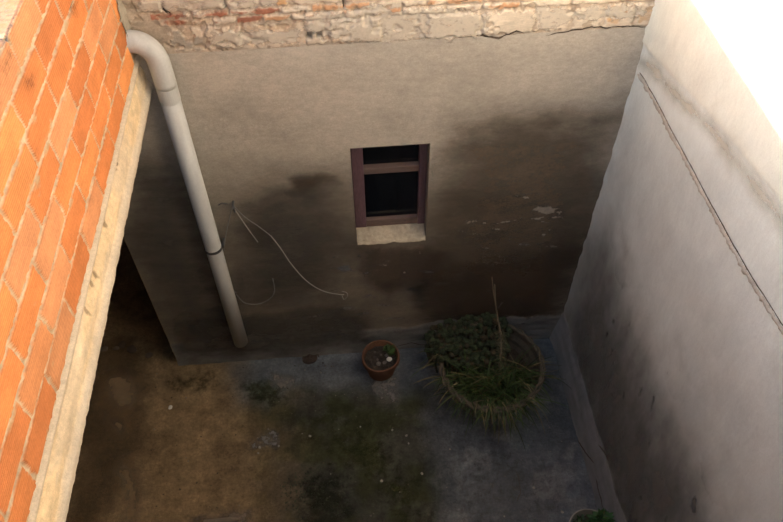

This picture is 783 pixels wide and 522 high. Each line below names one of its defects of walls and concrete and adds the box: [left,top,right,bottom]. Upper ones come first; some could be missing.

peeling [210,4,491,48]
leakage [138,168,367,355]
leakage [358,114,620,320]
flaking render [462,206,562,237]
crack [640,73,783,326]